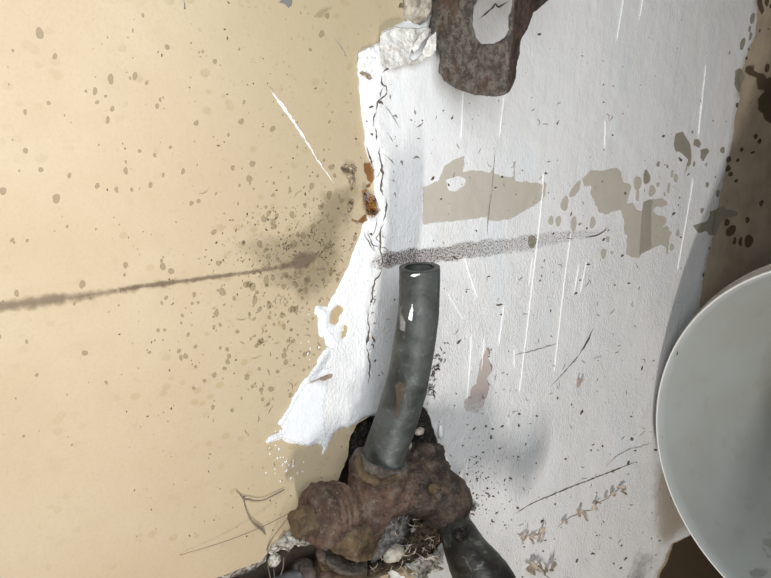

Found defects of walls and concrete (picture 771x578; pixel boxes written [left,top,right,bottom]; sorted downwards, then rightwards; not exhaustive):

peeling [358,26,436,74]
damp [735,0,771,123]
corrosion [364,163,374,187]
crack [365,68,389,382]
damp [423,157,546,224]
damp [548,161,679,258]
damp [674,131,709,170]
damp [694,206,753,247]
flaking render [300,306,347,360]
flaking render [265,368,333,482]
spalling [218,531,317,578]
flaking render [388,534,444,578]